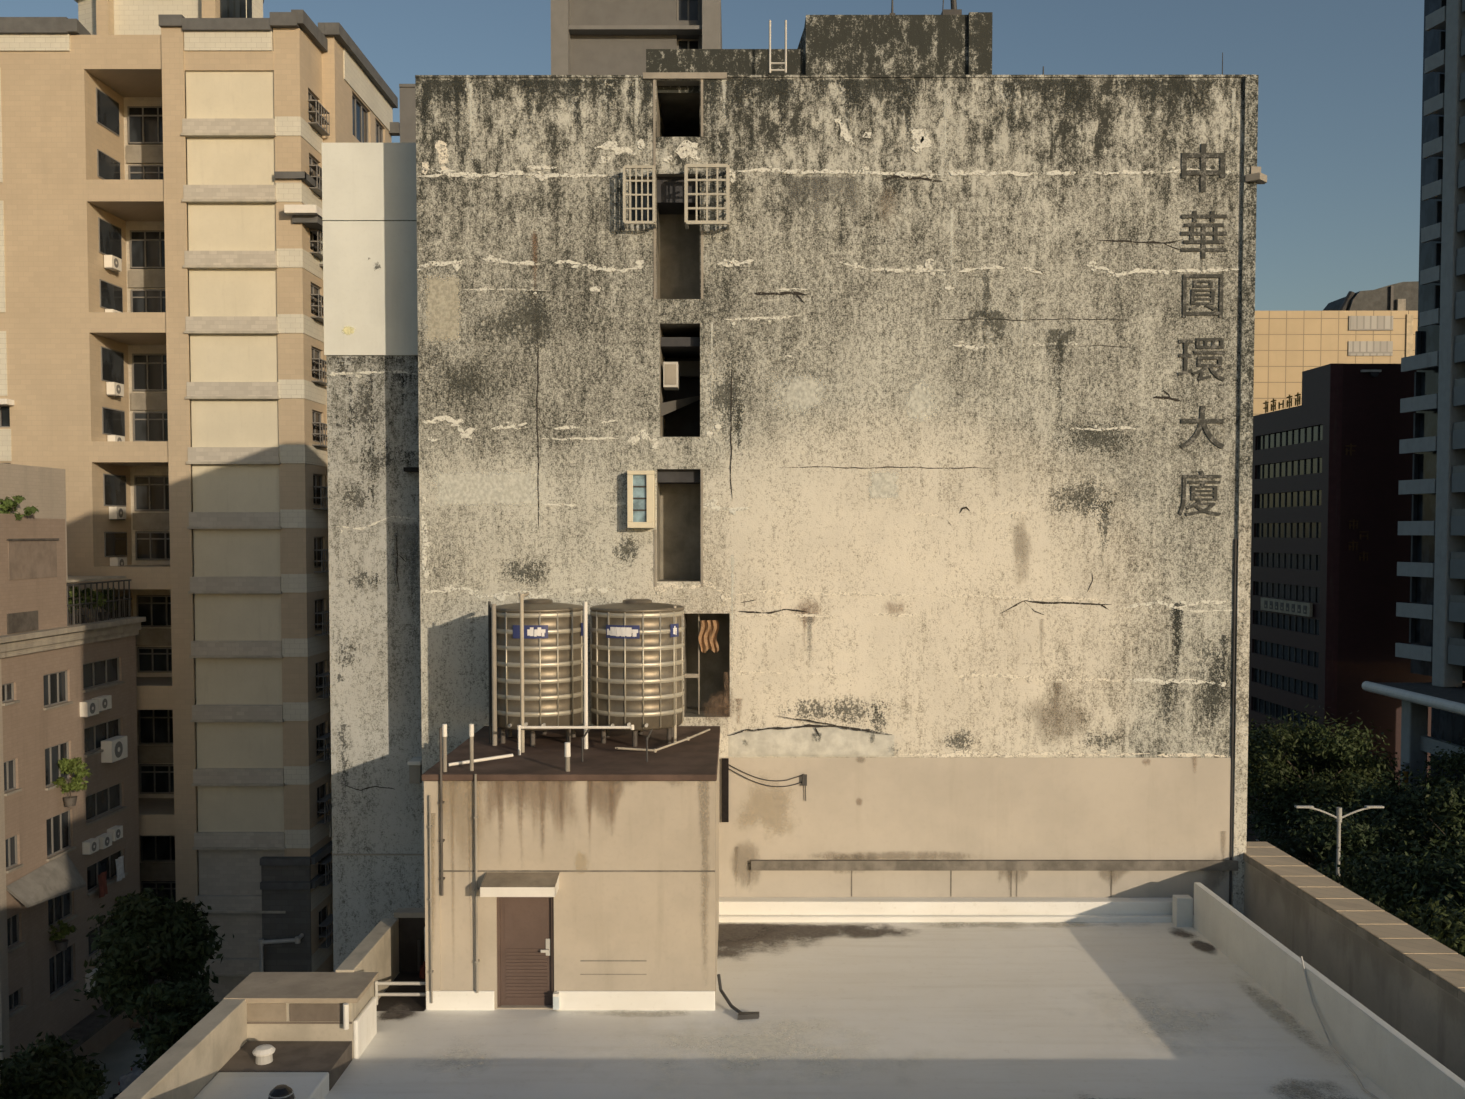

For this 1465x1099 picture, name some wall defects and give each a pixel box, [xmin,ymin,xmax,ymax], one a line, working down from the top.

leakage [490,78,651,146]
peeling [418,139,645,181]
leakage [707,79,797,207]
peeling [730,166,1235,183]
crack [1099,239,1183,250]
peeling [482,255,644,292]
crack [754,292,807,303]
peeling [423,415,528,442]
crack [738,600,809,614]
crack [1000,574,1111,615]
leakage [787,698,888,733]
leakage [717,924,907,957]